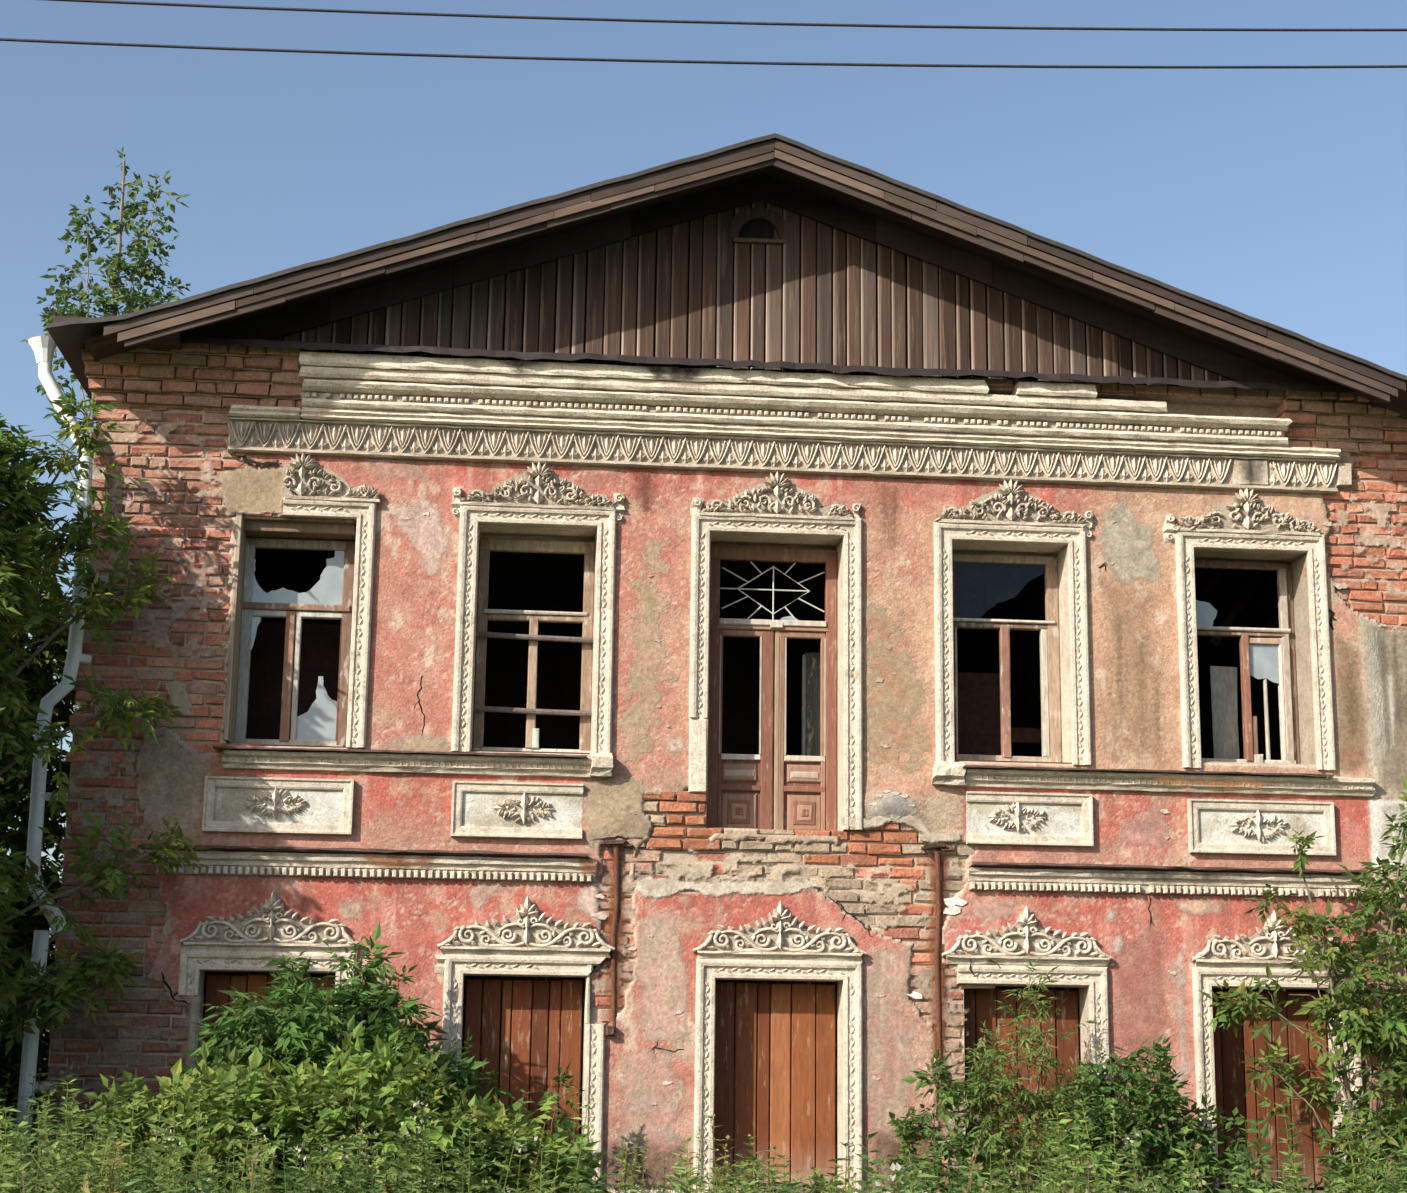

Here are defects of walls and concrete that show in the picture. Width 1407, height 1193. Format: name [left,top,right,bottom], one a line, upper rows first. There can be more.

peeling [1100,504,1160,584]
spalling [1323,453,1407,631]
spalling [41,405,283,1164]
crack [413,676,425,736]
peeling [619,538,685,761]
peeling [862,584,931,773]
leakage [1341,630,1407,782]
rust [608,862,622,1023]
spalling [578,779,1013,1192]
rust [930,860,946,965]